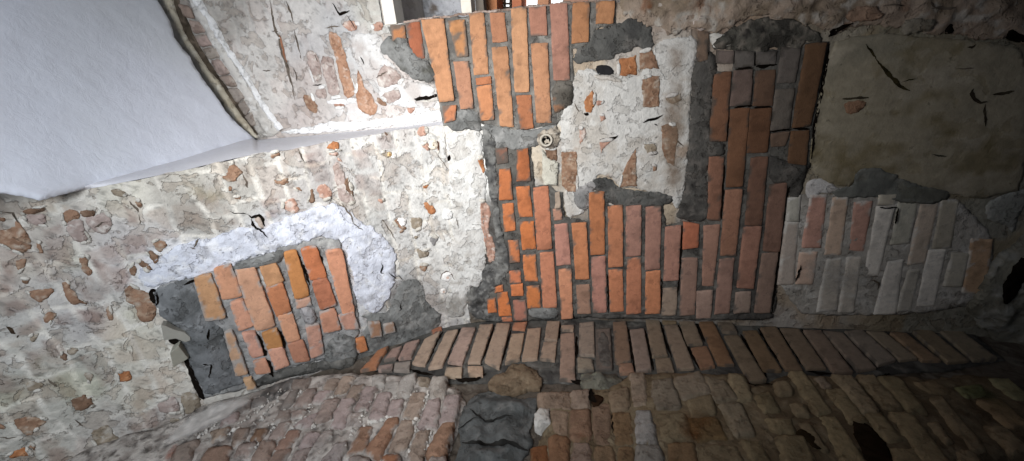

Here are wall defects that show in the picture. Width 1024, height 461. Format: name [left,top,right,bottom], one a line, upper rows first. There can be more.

crack [230,211,267,237]
peeling [124,20,495,322]
peeling [541,35,697,219]
peeling [805,178,841,198]